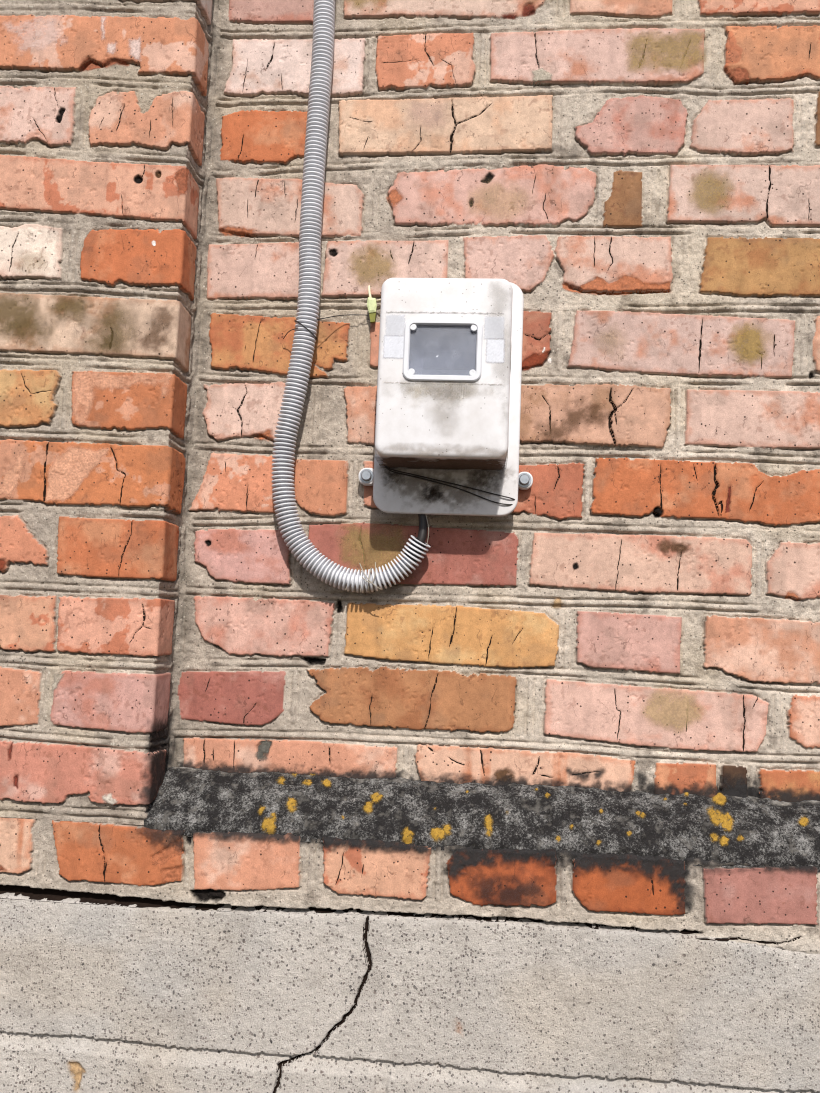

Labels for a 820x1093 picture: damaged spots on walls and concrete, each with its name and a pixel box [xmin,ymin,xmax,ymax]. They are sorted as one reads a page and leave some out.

crack [383,35,491,153]
crack [608,388,633,445]
crack [693,464,723,516]
crack [0,825,646,1093]
crack [676,929,801,944]